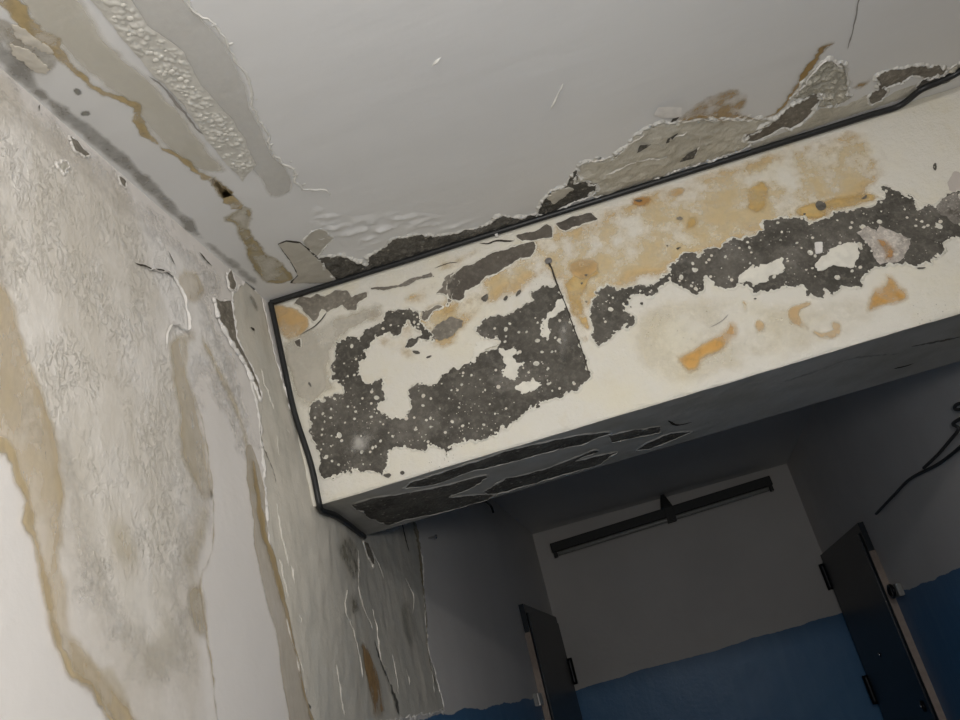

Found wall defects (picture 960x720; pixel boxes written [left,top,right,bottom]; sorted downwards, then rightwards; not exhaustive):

peeling [10,24,54,74]
crack [848,0,860,47]
leakage [796,138,875,219]
spalling [278,55,960,481]
leakage [540,172,782,328]
leakage [275,305,379,402]
peeling [0,95,690,720]
leakage [0,437,38,547]
leakage [44,577,87,682]
leakage [246,445,314,720]